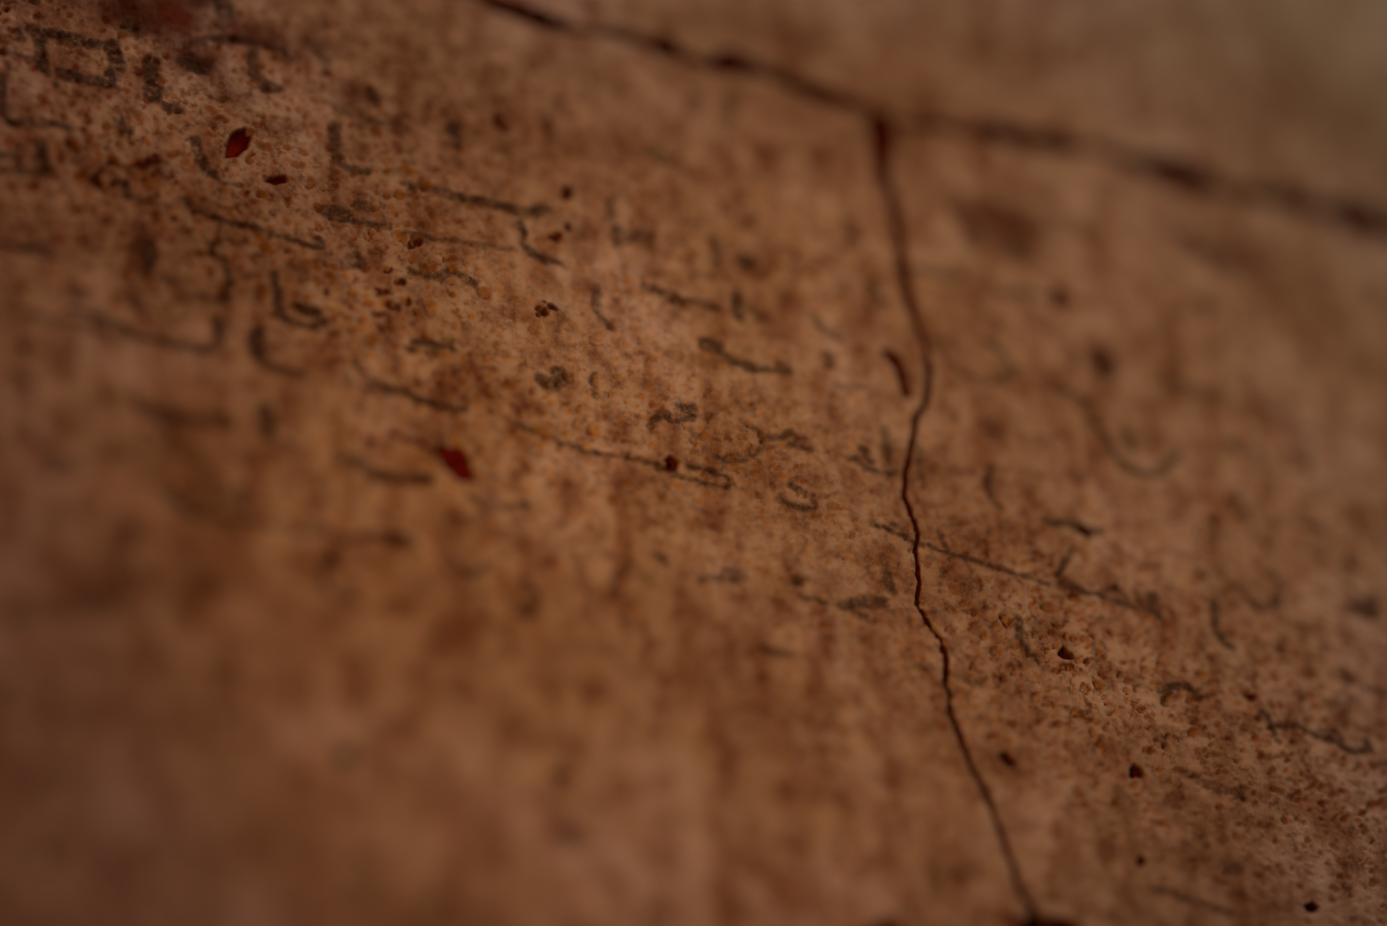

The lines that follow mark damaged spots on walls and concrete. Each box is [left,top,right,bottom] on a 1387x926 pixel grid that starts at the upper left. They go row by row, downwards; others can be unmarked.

crack [480,0,1387,926]